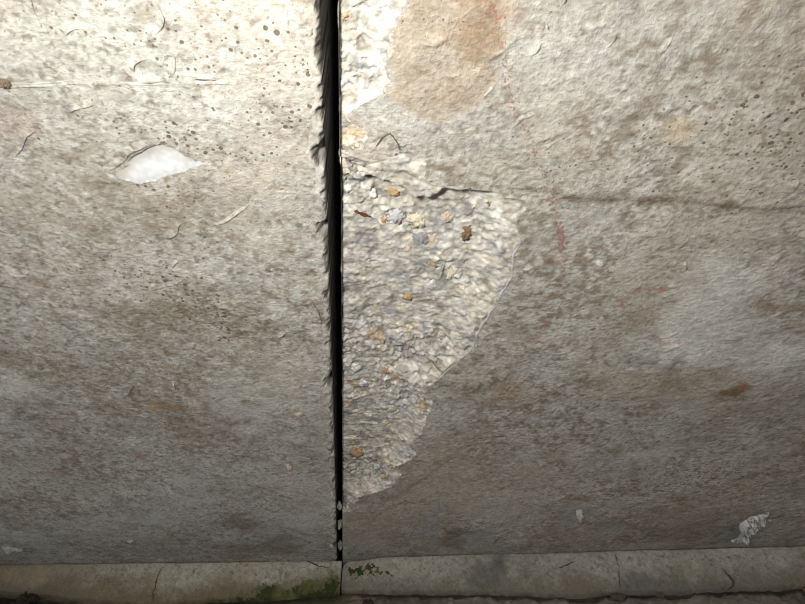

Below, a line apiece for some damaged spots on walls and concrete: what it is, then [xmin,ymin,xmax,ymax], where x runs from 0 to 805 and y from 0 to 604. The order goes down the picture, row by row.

peeling [122,53,221,83]
peeling [103,139,203,184]
spalling [300,0,527,560]